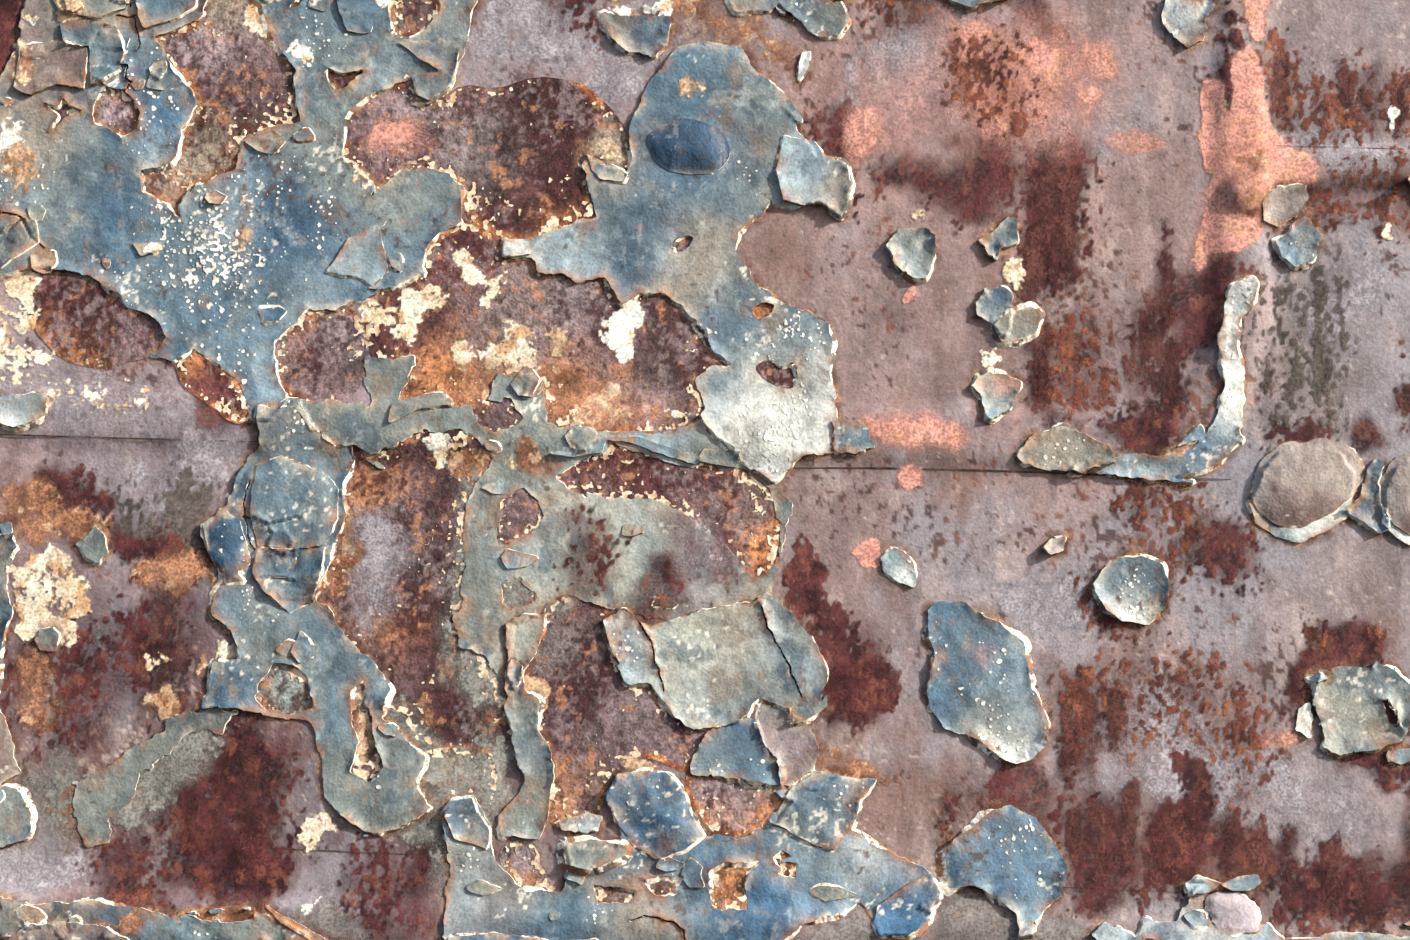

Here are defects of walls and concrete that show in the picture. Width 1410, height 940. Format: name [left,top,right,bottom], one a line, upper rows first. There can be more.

rust [798,0,1264,456]
rust [1207,0,1410,256]
rust [0,452,328,935]
peeling [0,0,1069,940]
rust [637,502,764,621]
rust [782,533,902,737]
peeling [1014,275,1260,487]
rust [935,474,1410,938]
peeling [1246,458,1410,547]
peeling [1292,661,1410,768]
rust [338,831,439,940]
peeling [1087,871,1410,940]